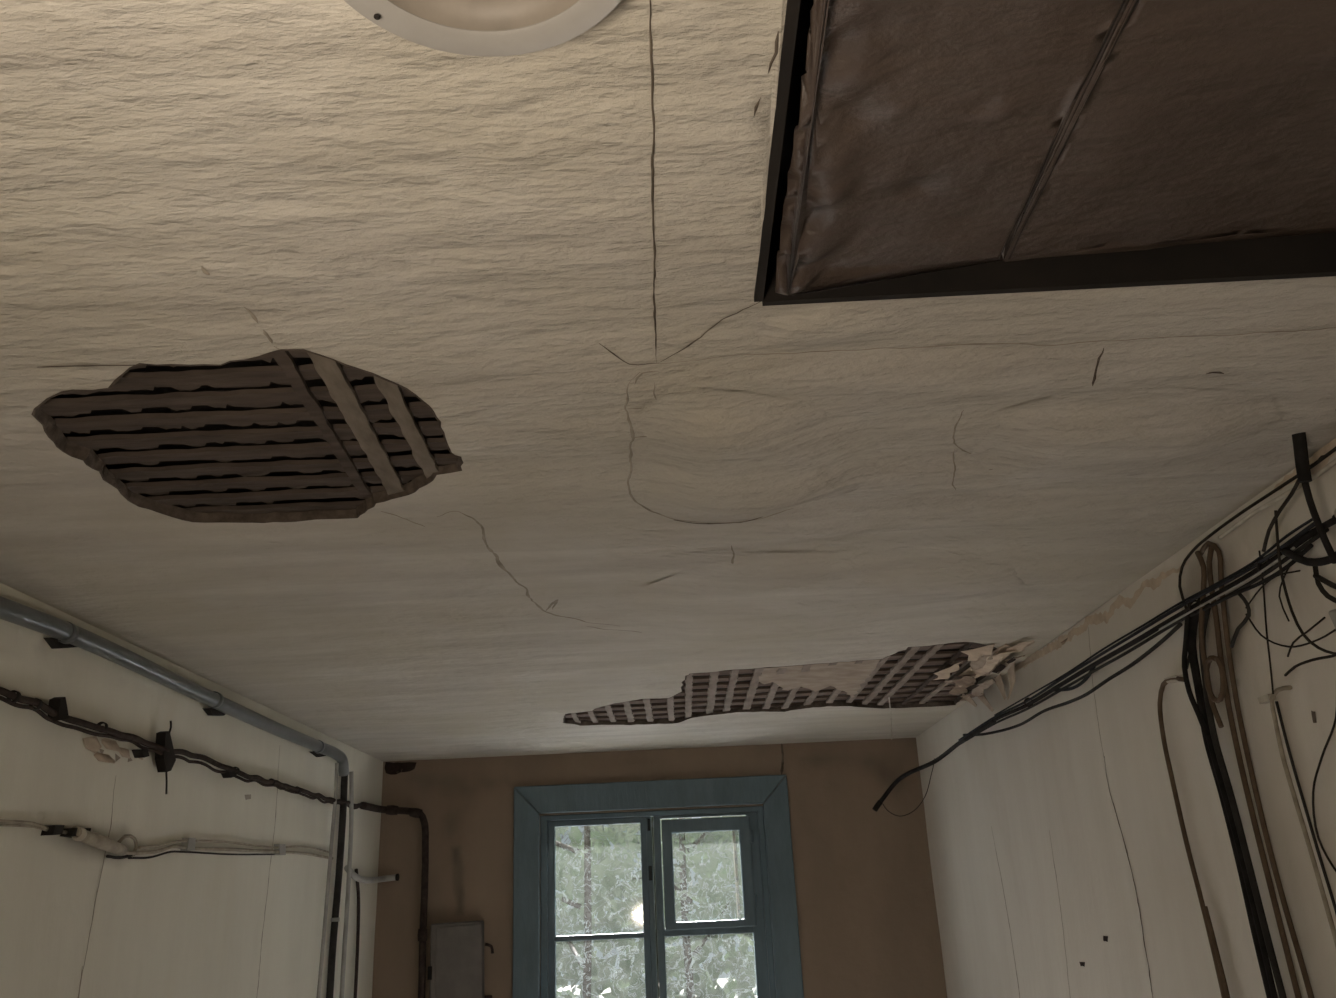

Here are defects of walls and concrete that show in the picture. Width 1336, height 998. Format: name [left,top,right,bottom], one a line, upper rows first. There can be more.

crack [599,0,1336,564]
spalling [31,349,463,523]
crack [381,511,642,633]
spalling [563,638,1068,740]